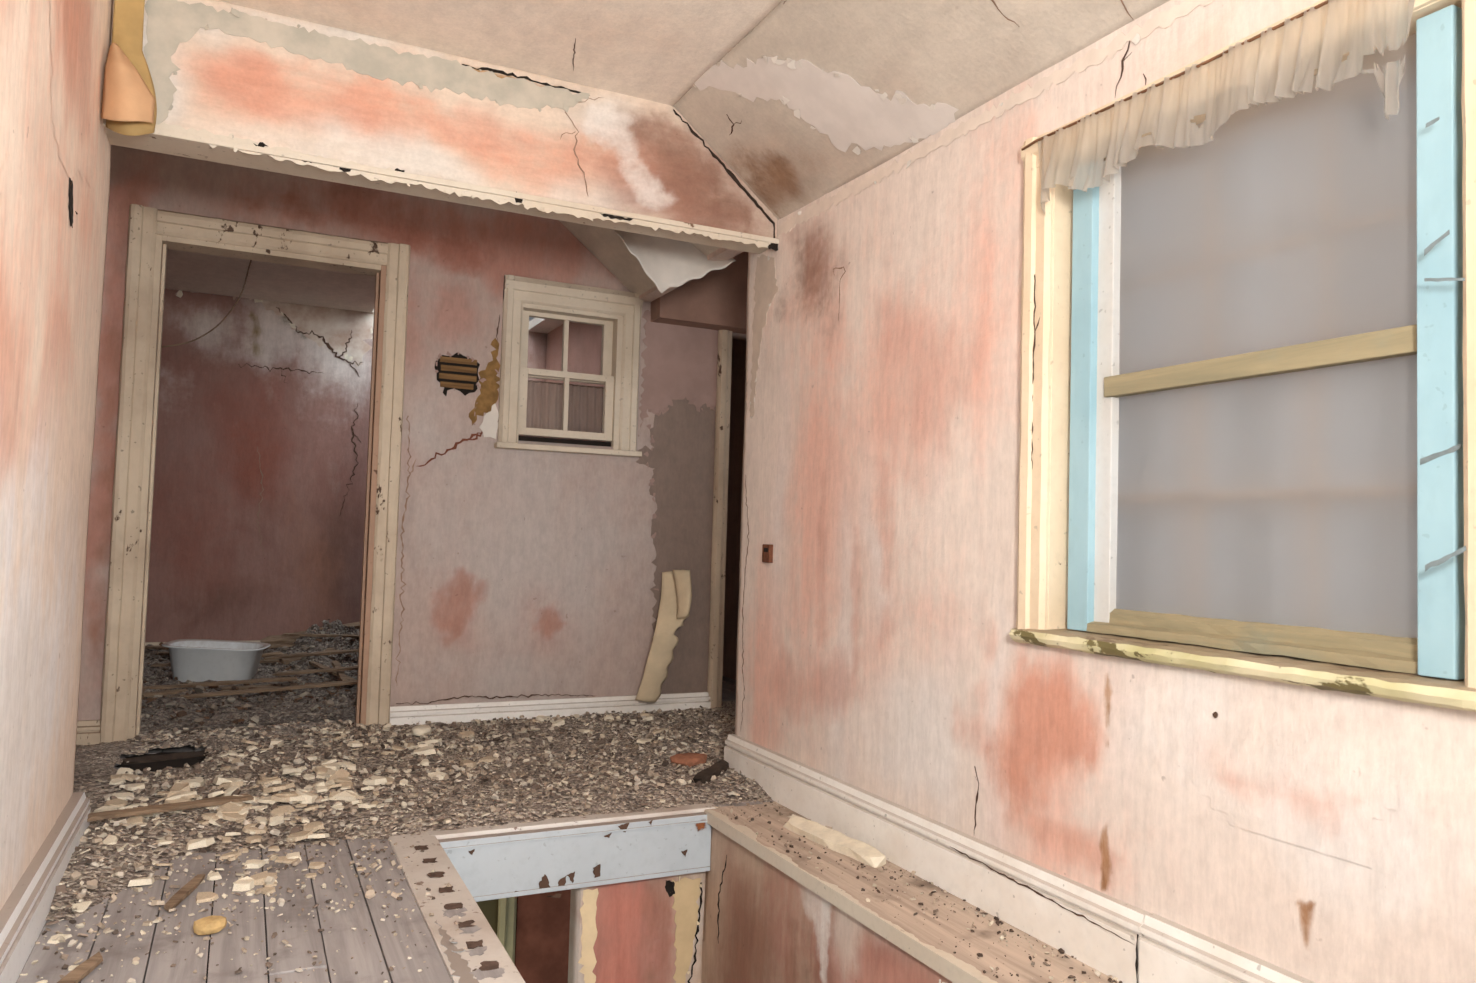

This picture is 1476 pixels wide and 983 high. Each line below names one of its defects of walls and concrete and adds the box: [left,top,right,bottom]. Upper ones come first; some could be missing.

peeling [101,0,778,418]
crack [462,38,601,195]
peeling [693,55,959,155]
crack [239,307,362,515]
flaking render [434,338,500,439]
crack [395,416,592,705]
leakage [173,28,1021,759]
flaking render [636,395,717,694]
leakage [939,596,1136,903]